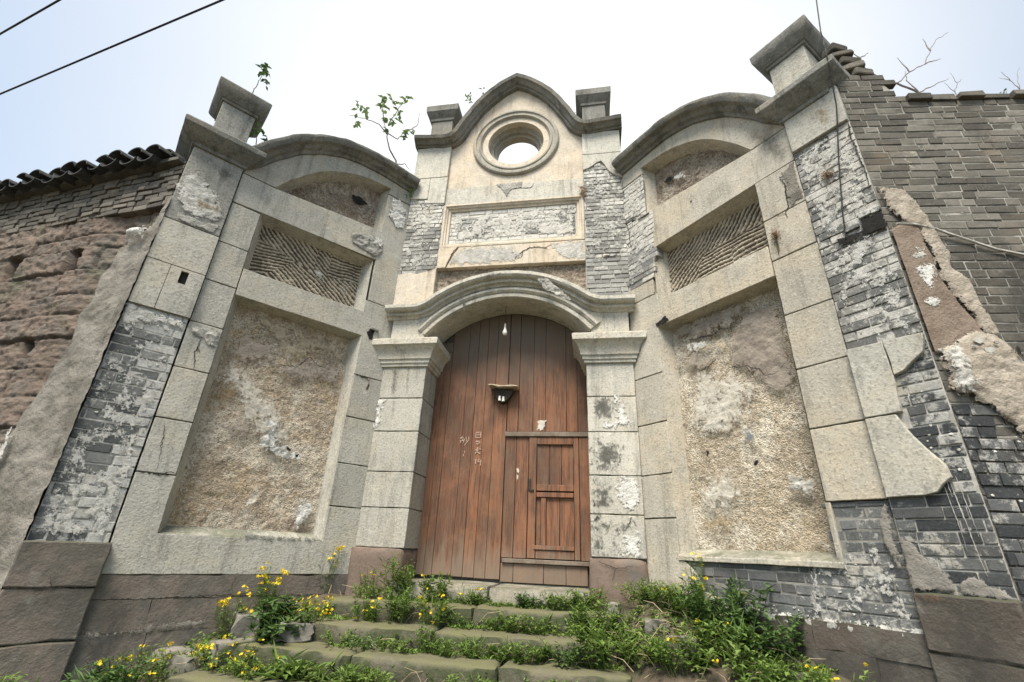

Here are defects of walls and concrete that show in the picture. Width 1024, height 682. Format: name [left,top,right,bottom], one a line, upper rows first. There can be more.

spalling [351,232,384,256]
spalling [0,169,227,591]
flaking render [219,315,345,462]
flaking render [603,395,632,431]
spalling [674,122,1024,637]
crack [138,425,173,476]
flaking render [615,475,644,513]
flaking render [620,531,642,558]